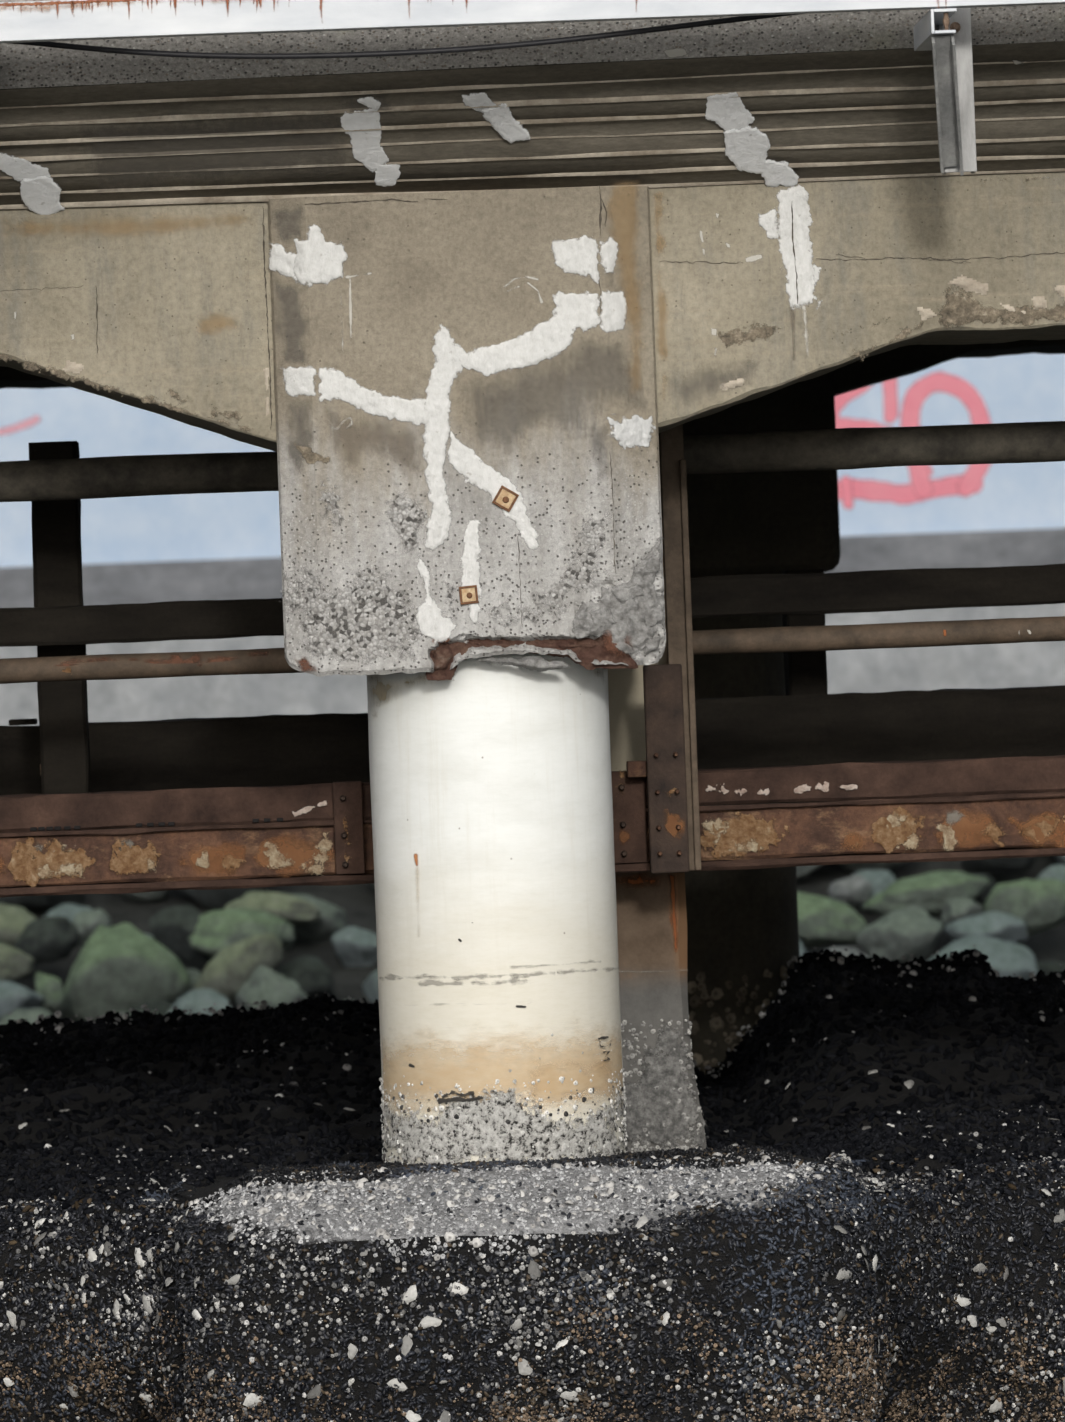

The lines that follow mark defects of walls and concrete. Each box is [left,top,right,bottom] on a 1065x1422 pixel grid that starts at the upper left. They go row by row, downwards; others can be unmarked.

rust [0,0,176,15]
water stain [342,272,372,346]
spalling [860,274,1065,342]
spalling [720,378,745,391]
rust [605,633,632,654]